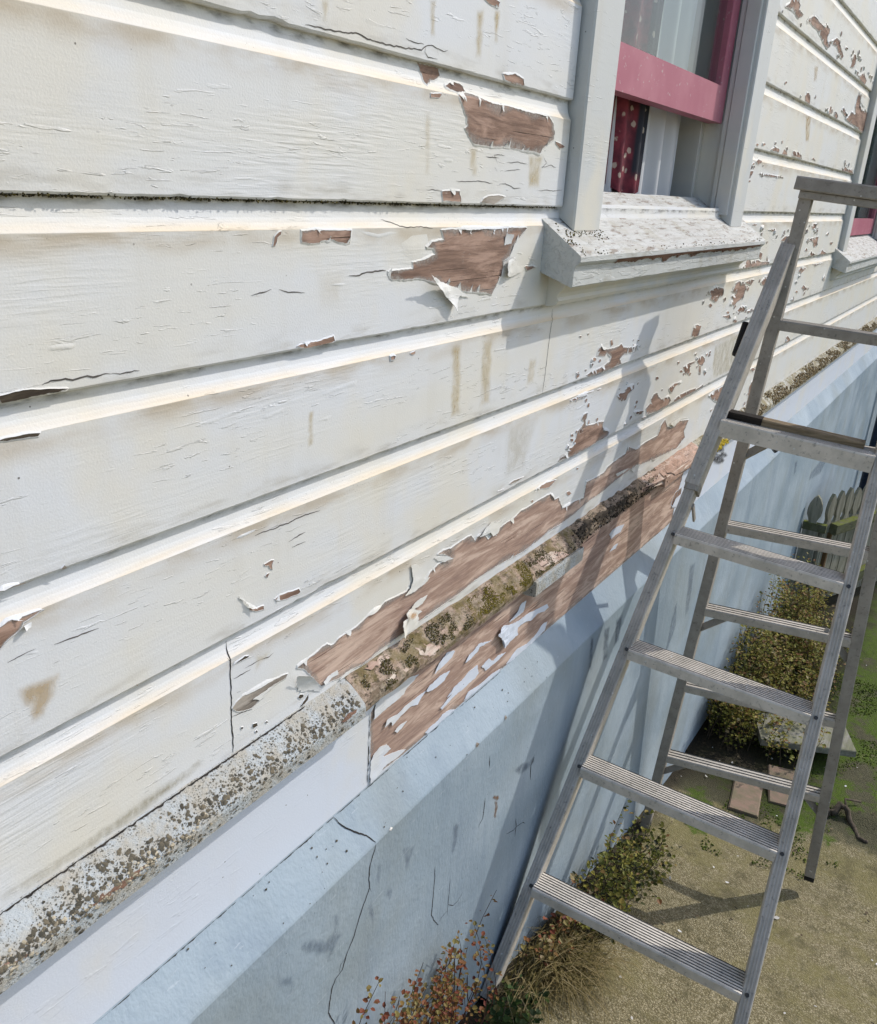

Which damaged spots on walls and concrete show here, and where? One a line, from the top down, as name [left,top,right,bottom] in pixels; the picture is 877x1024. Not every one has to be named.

peeling [417,63,565,157]
peeling [782,0,874,133]
peeling [300,227,352,246]
peeling [387,225,536,312]
peeling [576,339,641,379]
peeling [230,350,723,783]
peeling [0,608,44,650]
damp [26,684,48,710]
crack [0,644,305,915]
crack [100,672,500,1024]